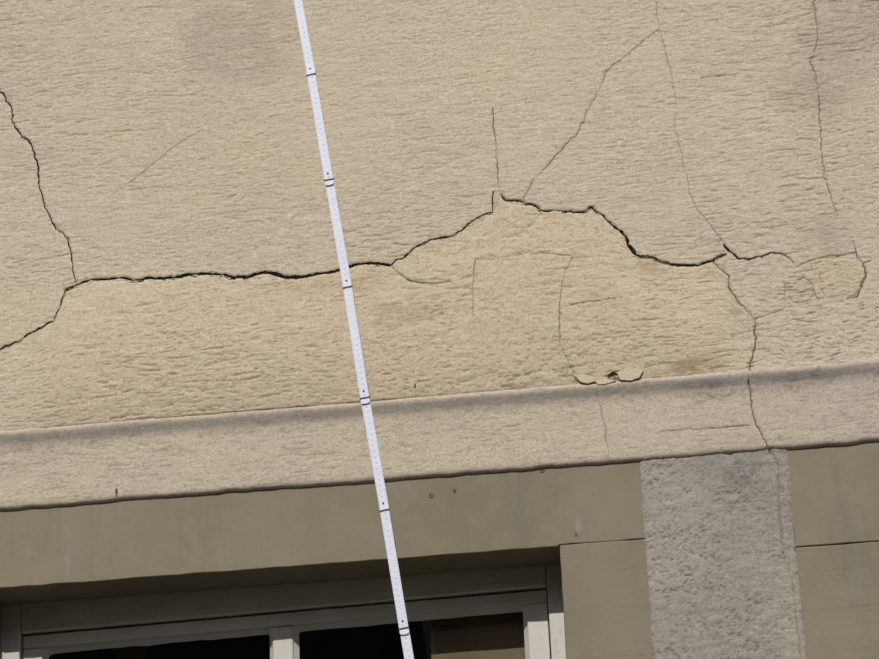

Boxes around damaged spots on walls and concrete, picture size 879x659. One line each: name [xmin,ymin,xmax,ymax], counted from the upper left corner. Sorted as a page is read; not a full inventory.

crack [0,91,340,351]
crack [349,0,801,659]
spalling [574,369,643,385]
crack [810,0,838,214]